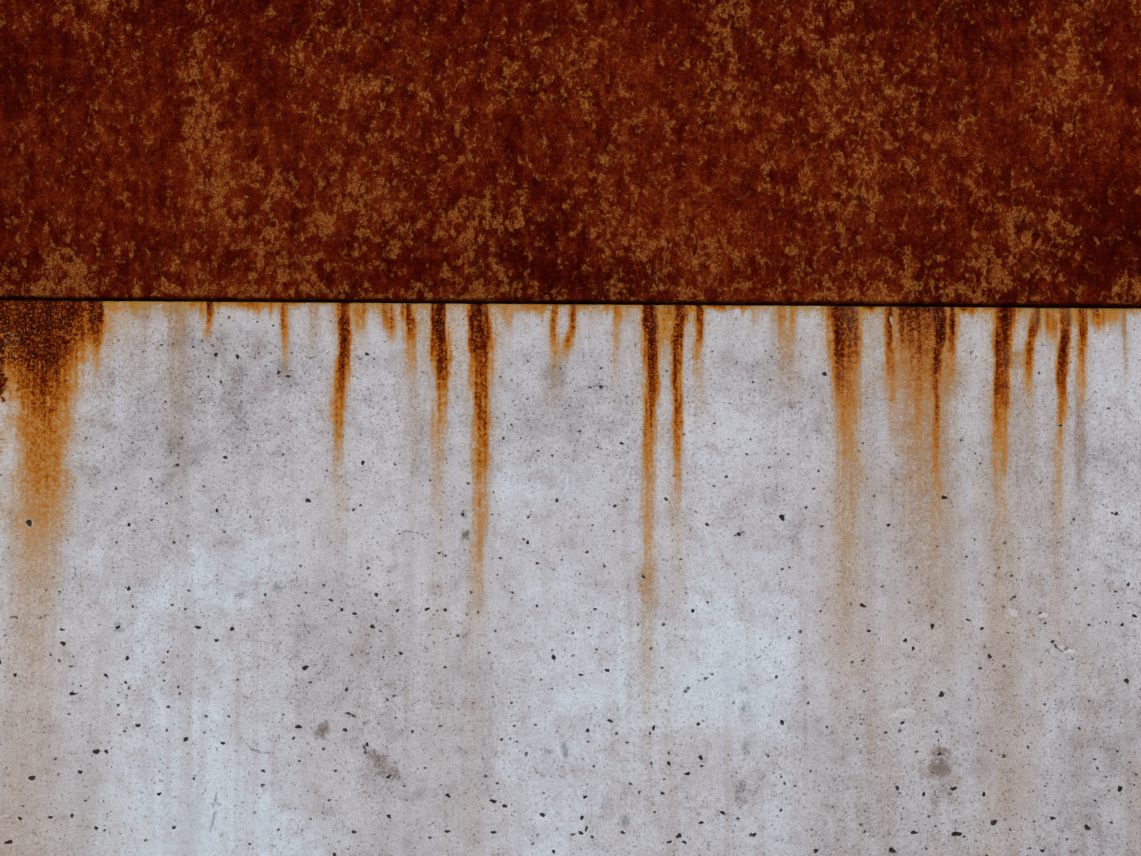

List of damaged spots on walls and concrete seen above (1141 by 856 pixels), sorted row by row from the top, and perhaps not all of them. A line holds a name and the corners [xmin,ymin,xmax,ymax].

corrosion [0,300,1141,614]